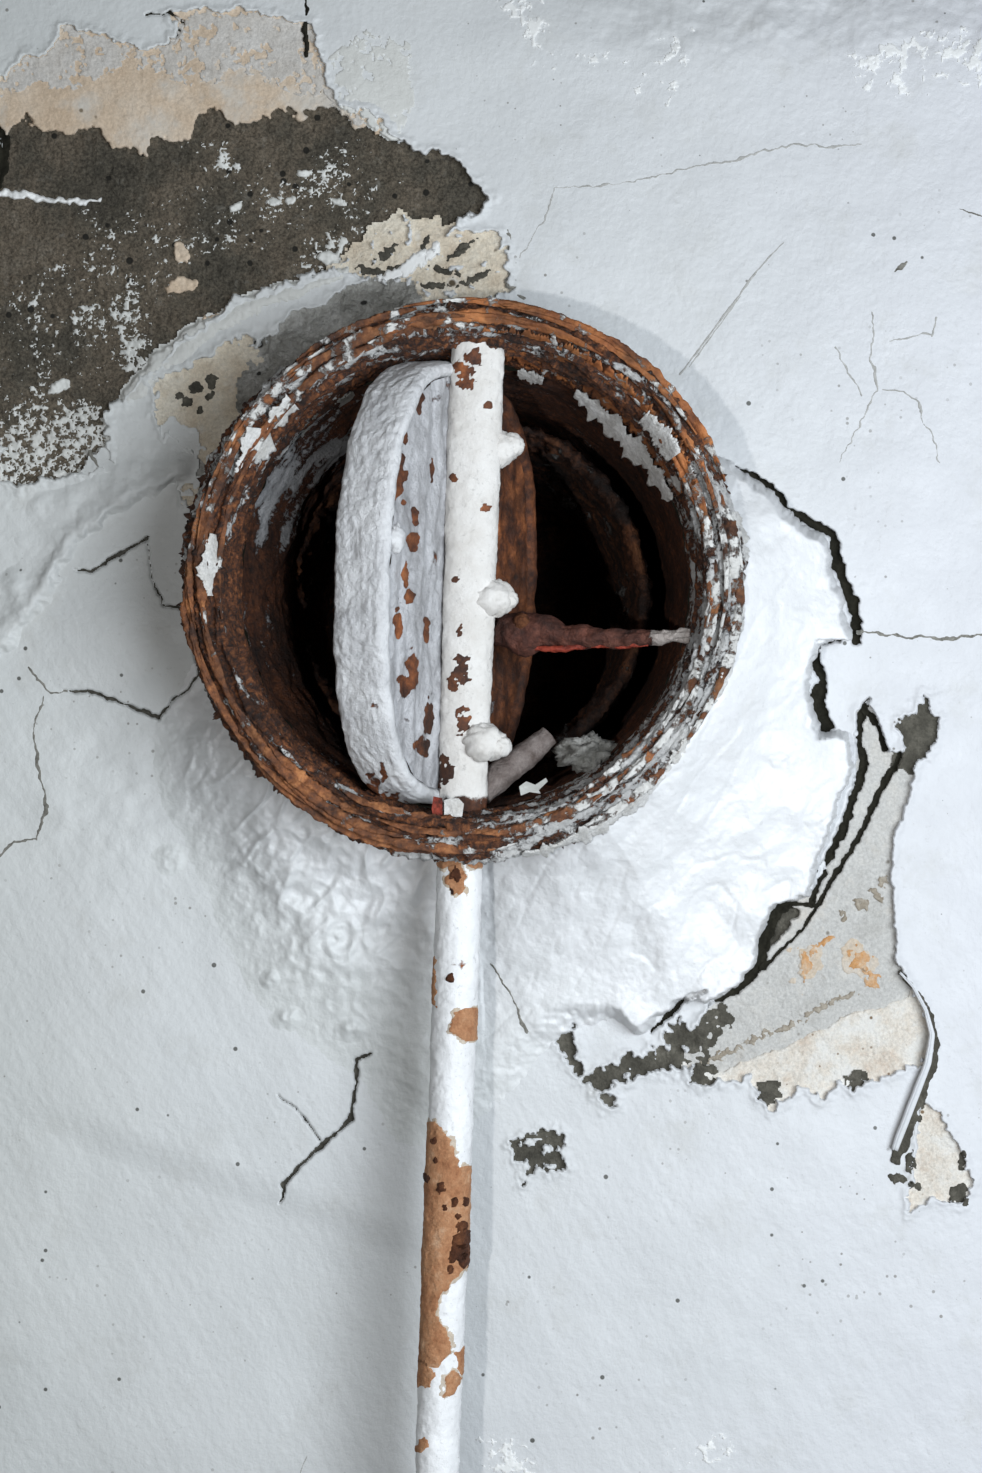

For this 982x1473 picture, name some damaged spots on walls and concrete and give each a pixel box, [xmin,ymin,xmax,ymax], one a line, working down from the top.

crack [0,127,10,189]
flaking render [0,6,511,506]
crack [78,536,180,609]
rust [176,297,745,898]
crack [0,660,199,857]
peeling [522,726,693,858]
rust [431,956,478,1044]
flaking render [556,695,973,1212]
crack [280,1052,372,1202]
flaking render [509,1128,566,1187]
rust [417,1117,472,1399]
rust [415,1437,429,1453]